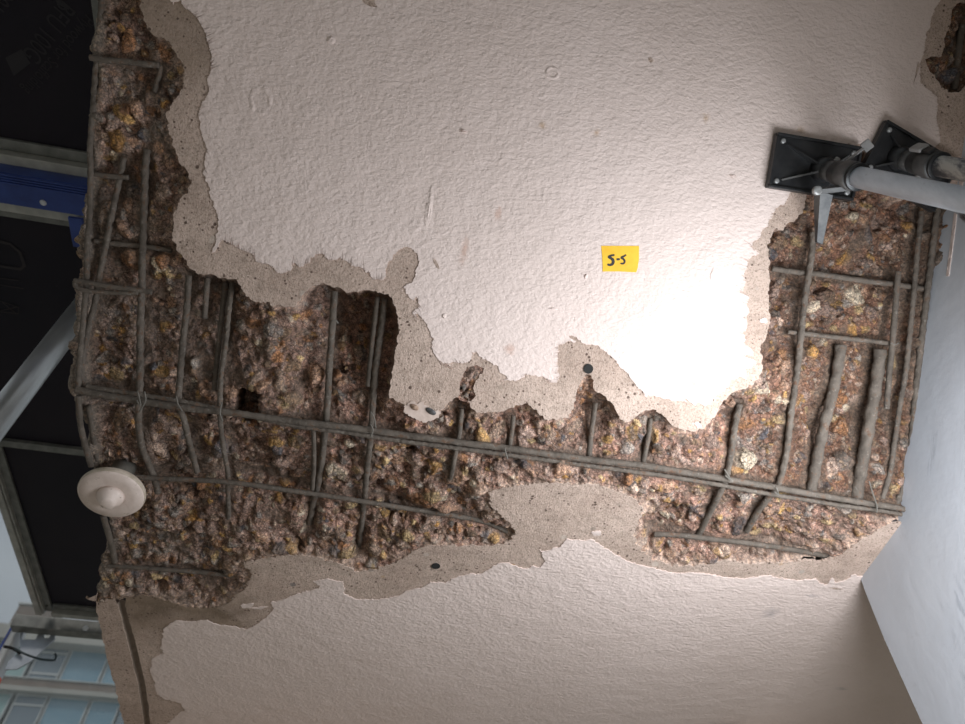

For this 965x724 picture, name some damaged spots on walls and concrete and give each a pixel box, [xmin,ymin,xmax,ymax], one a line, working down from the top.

spalling [74,0,948,512]
peeling [913,0,965,158]
spalling [68,259,903,724]